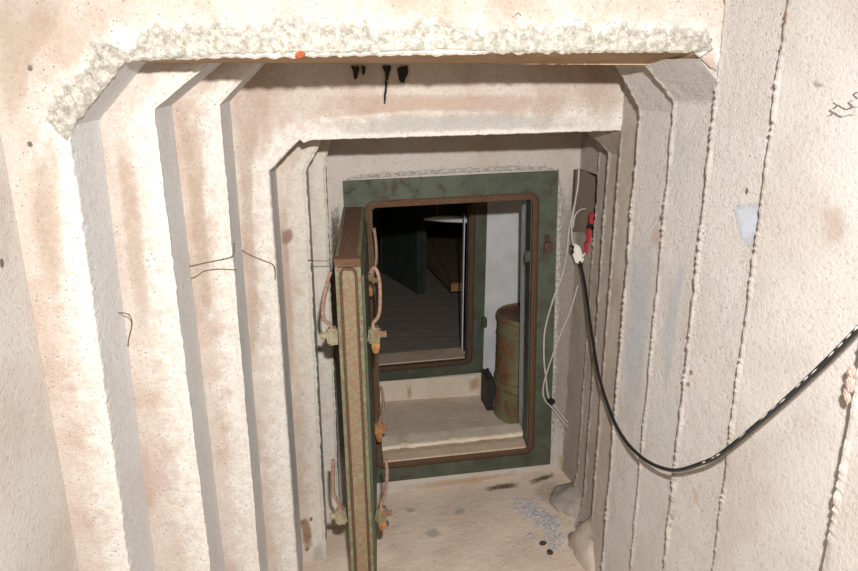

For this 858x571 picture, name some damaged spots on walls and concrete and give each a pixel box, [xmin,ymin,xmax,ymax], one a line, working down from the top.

damp [382,65,408,111]
crack [833,92,858,110]
rust [364,193,539,469]